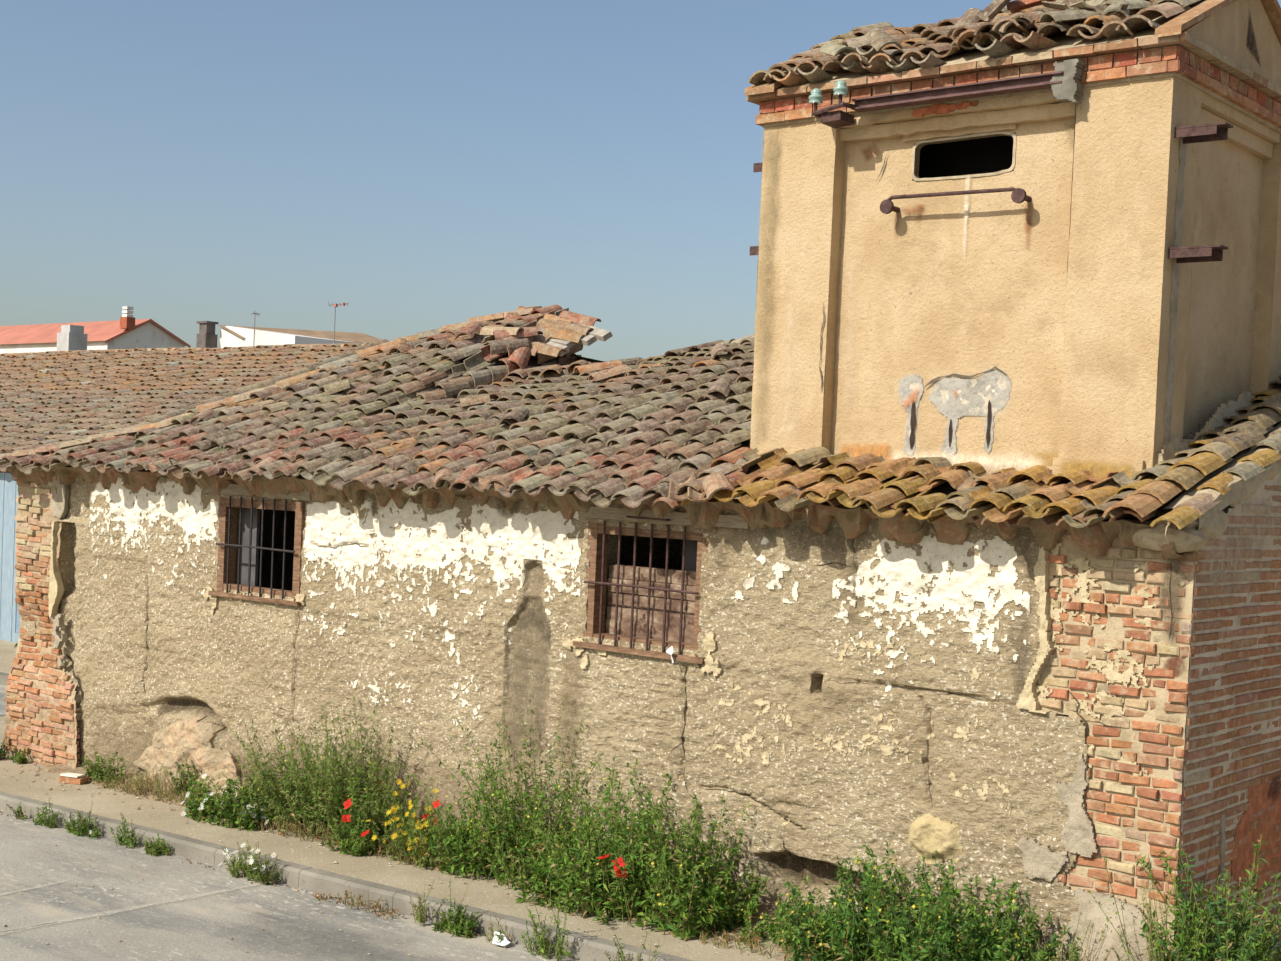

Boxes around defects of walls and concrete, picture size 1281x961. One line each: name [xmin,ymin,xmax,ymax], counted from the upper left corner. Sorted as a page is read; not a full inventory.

peeling [89,477,608,726]
crack [668,667,804,881]
spalling [681,632,796,766]
peeling [731,538,799,604]
peeling [813,711,1011,815]
crack [833,680,1016,803]
peeling [830,535,1115,714]
peeling [1076,670,1125,718]
peeling [1117,756,1148,777]
peeling [1130,562,1185,640]
spalling [1148,656,1182,677]
peeling [1019,837,1069,882]